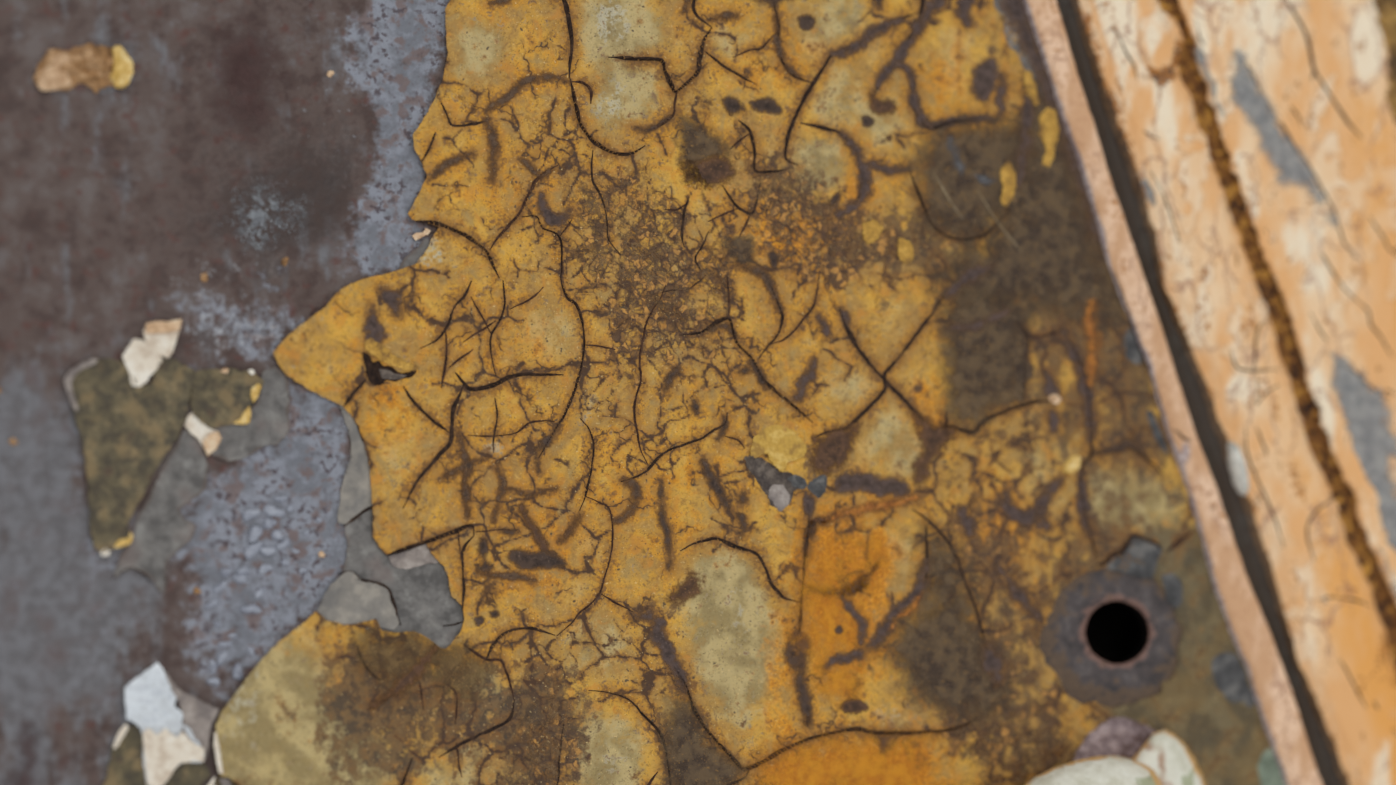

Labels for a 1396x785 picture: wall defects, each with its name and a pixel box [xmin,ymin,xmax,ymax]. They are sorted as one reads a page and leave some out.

rust [33,43,134,93]
rust [722,96,783,115]
rust [635,116,736,190]
rust [362,288,403,343]
rust [802,0,1144,555]
peeling [0,0,450,785]
crack [338,0,1193,785]
rust [612,476,671,569]
rust [634,610,688,693]
rust [667,572,705,606]
rust [783,526,1010,725]
rust [996,563,1182,707]